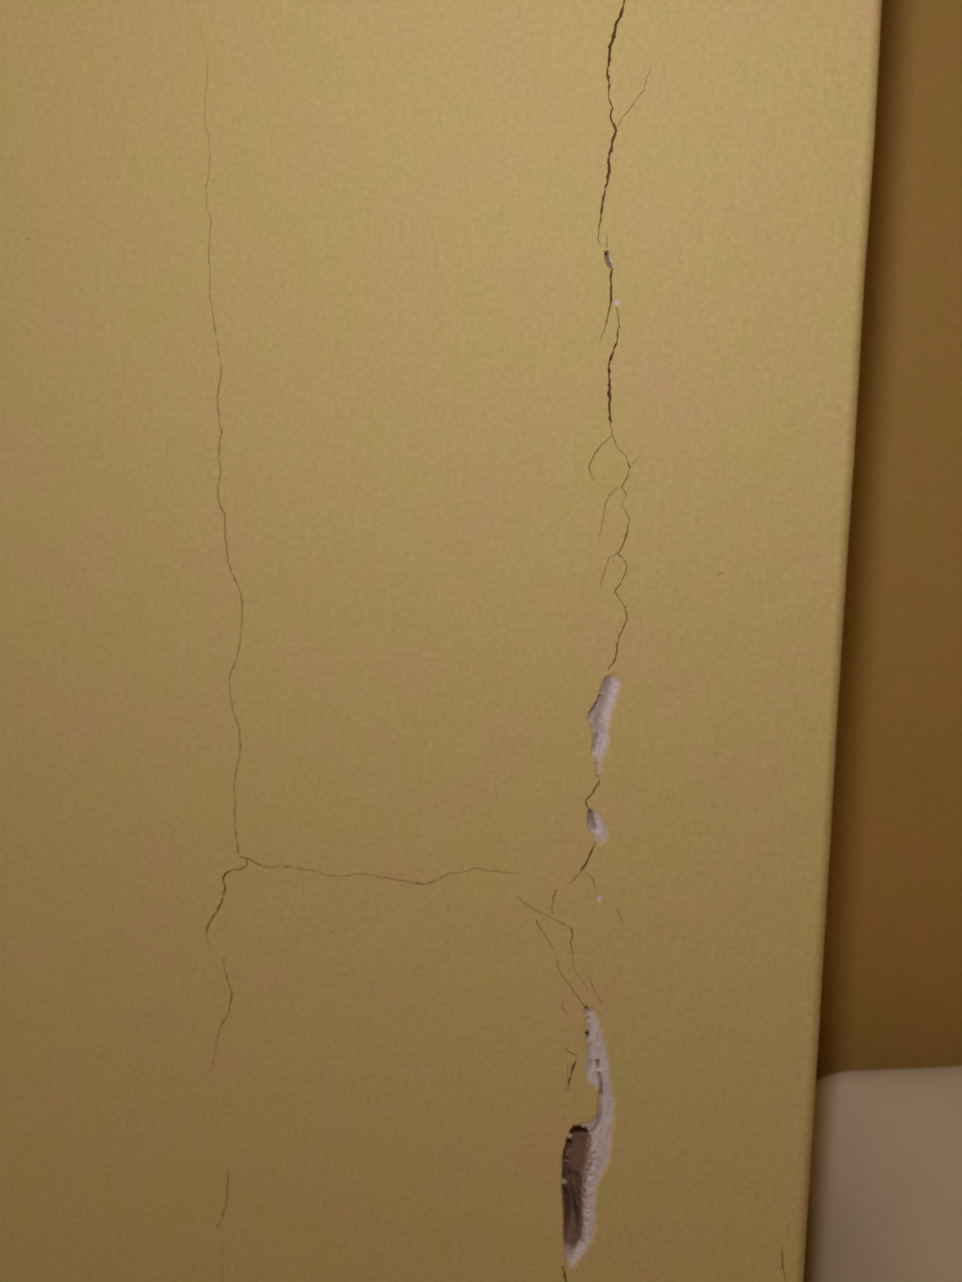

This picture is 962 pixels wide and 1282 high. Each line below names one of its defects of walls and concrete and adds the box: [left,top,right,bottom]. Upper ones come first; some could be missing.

crack [588,0,651,669]
crack [187,1,623,1072]
flaking render [586,807,610,847]
flaking render [586,673,623,780]
flaking render [561,1006,617,1271]